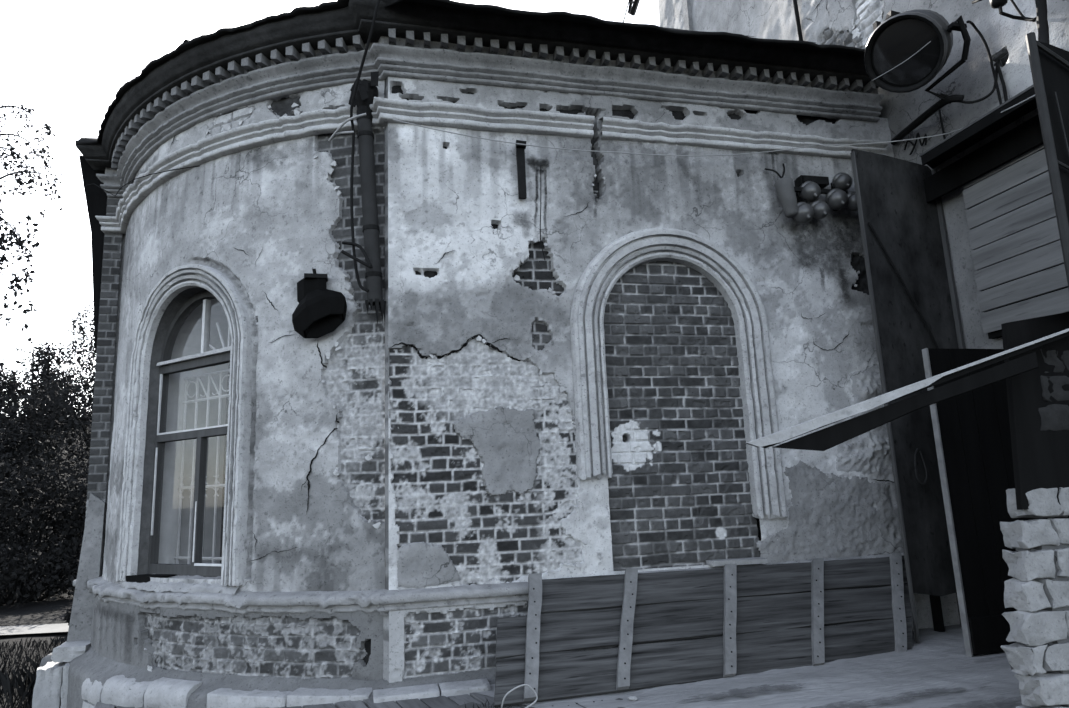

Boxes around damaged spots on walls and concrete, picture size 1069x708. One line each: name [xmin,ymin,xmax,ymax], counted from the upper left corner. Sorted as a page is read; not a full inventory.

spalling [821,0,884,49]
spalling [268,97,301,117]
spalling [612,110,635,119]
spalling [669,110,686,120]
spalling [850,254,869,295]
spalling [314,132,603,585]
crack [301,413,339,512]
spalling [143,613,371,679]
spalling [403,605,528,679]